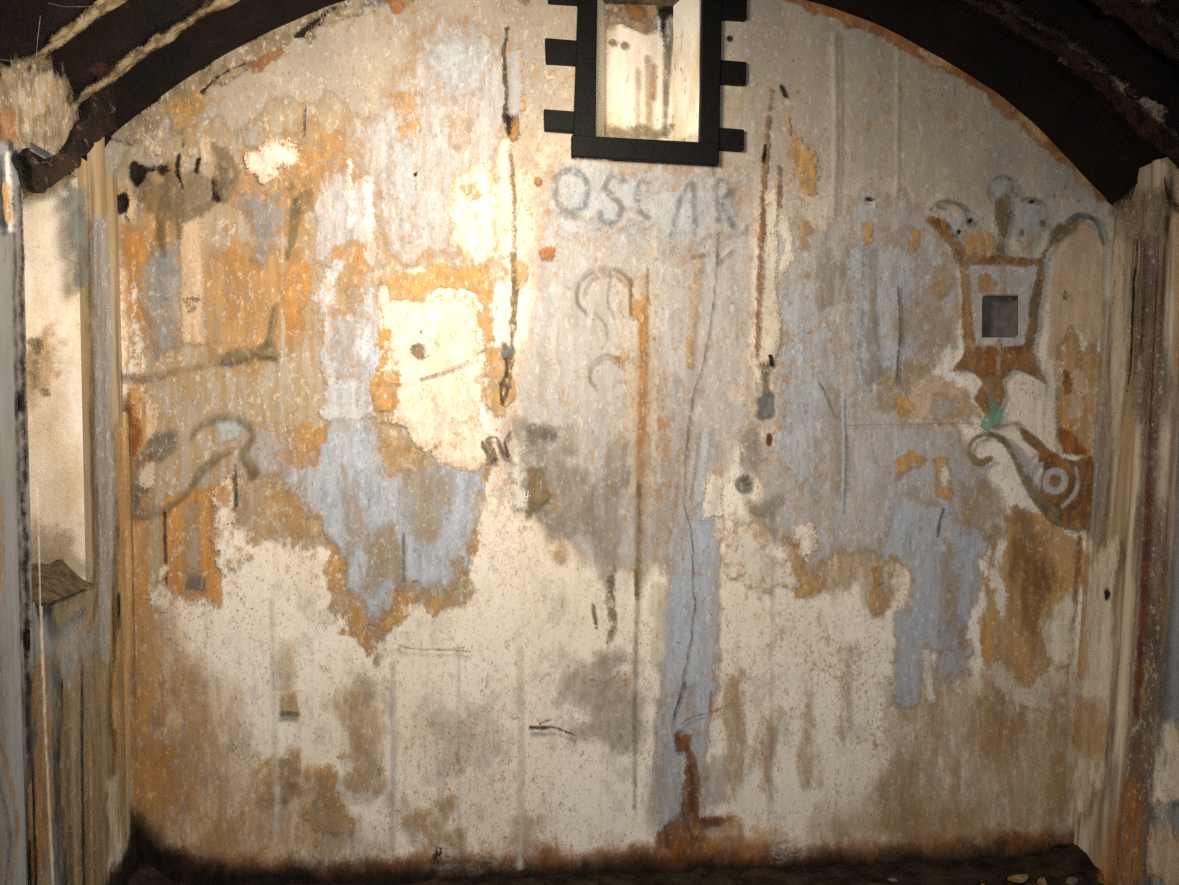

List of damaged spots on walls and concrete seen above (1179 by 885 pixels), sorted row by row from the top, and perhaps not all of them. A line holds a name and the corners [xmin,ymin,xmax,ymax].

spalling [785,0,1108,203]
peeling [90,0,756,846]
water stain [510,419,629,582]
rust [613,230,657,515]
peeling [722,115,1127,820]
water stain [54,568,1074,885]
rust [130,611,1074,876]
crack [673,604,733,724]